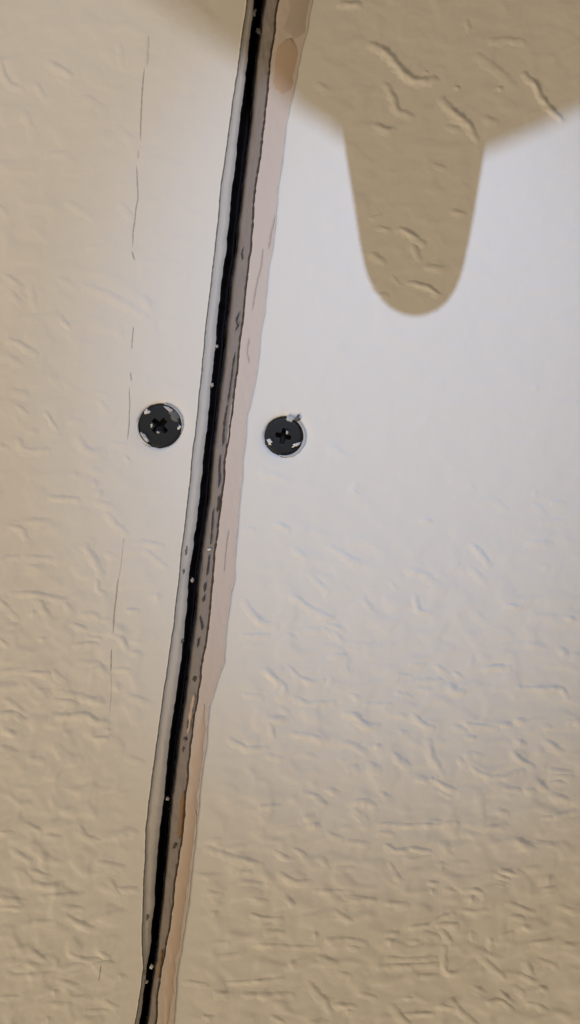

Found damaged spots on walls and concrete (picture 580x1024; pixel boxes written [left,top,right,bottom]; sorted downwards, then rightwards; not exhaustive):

crack [132,0,279,1024]
damp [273,0,310,93]